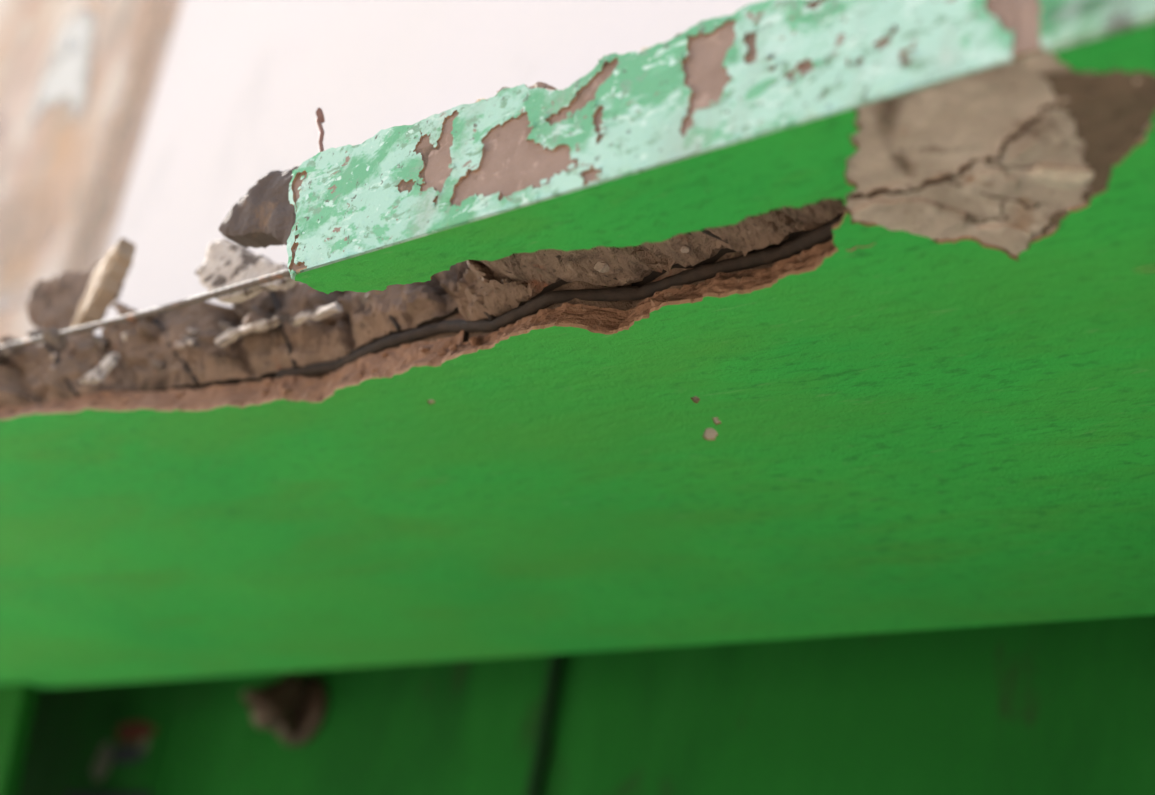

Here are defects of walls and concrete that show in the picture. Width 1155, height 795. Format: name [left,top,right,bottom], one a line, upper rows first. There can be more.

spalling [0,0,1155,419]